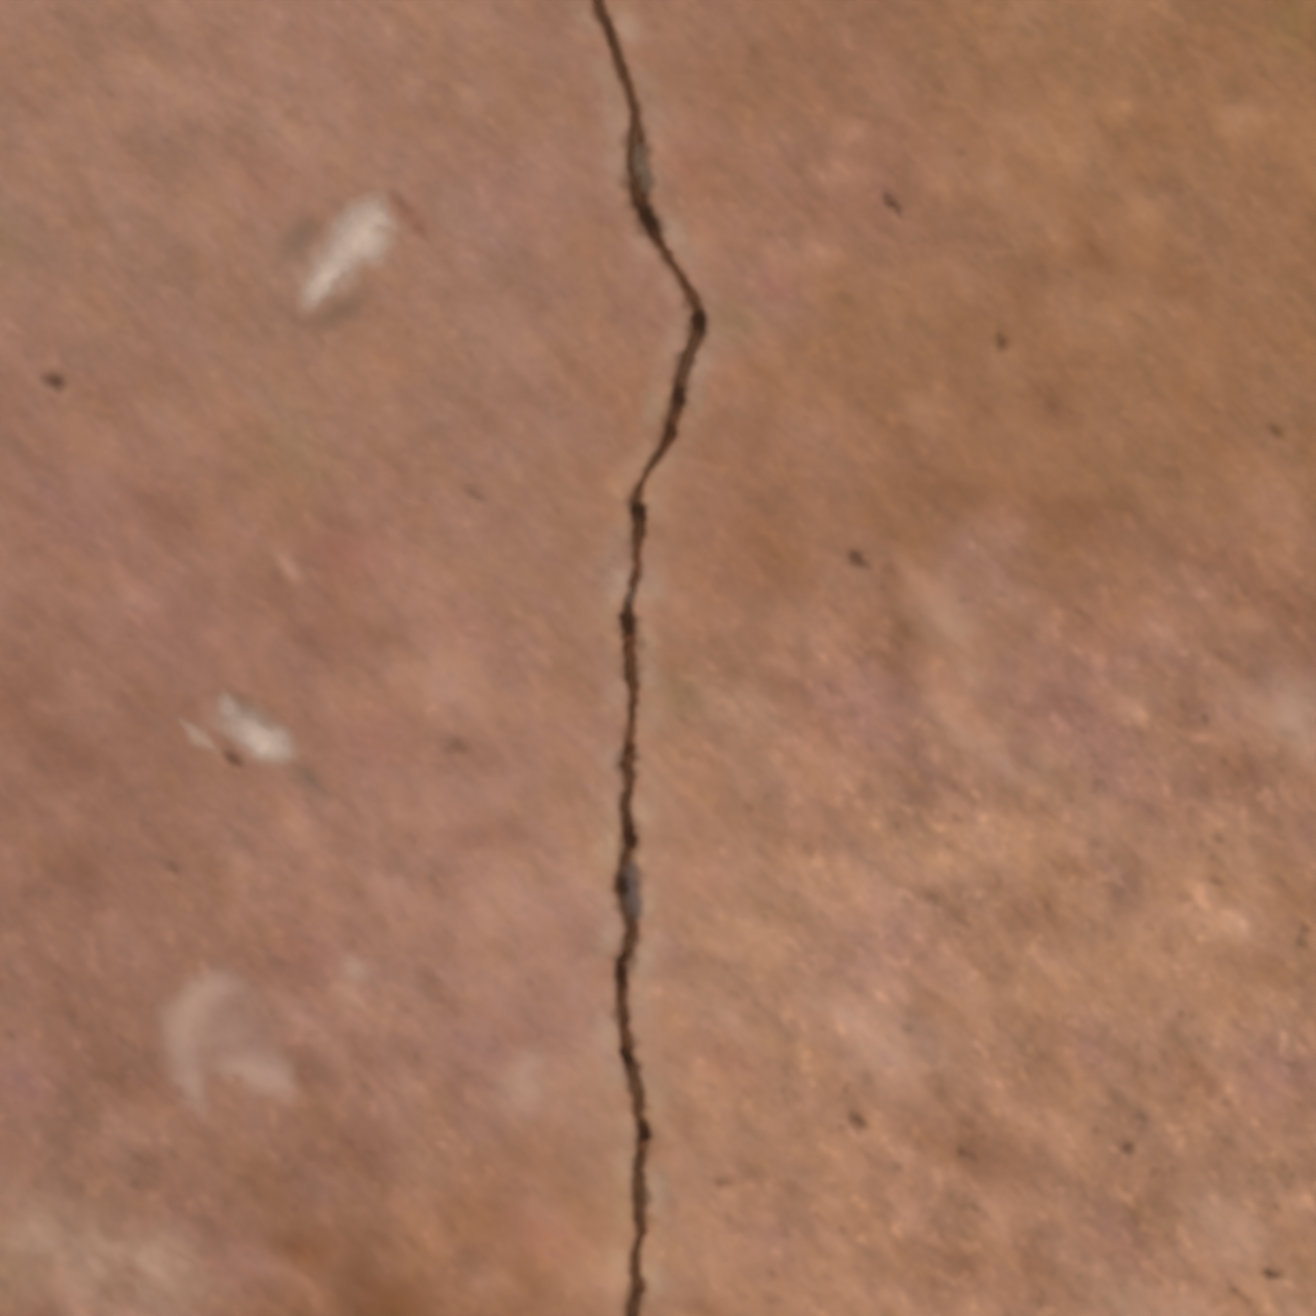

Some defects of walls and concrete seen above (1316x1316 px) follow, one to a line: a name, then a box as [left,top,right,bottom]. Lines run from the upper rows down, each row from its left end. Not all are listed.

crack [593,0,705,1316]